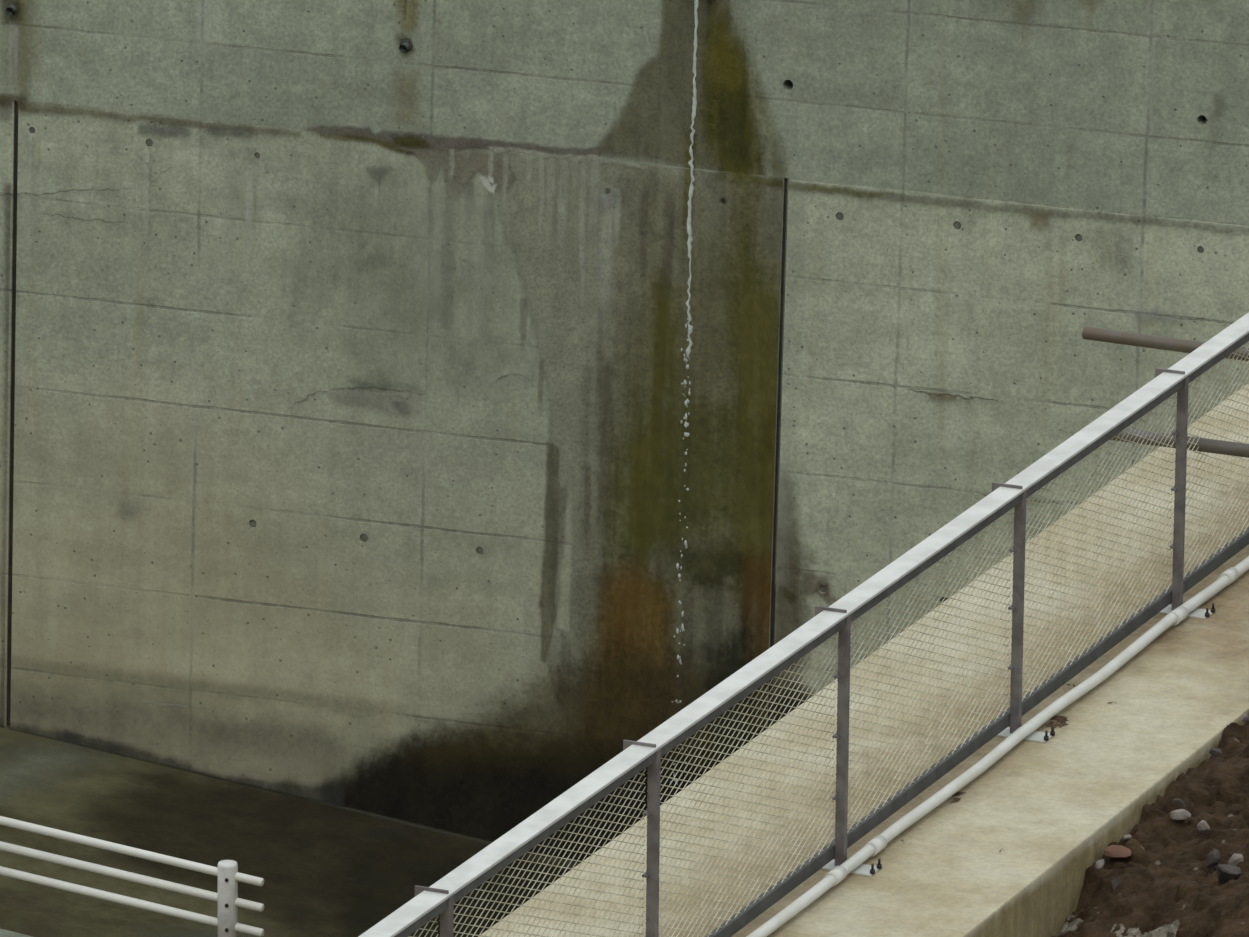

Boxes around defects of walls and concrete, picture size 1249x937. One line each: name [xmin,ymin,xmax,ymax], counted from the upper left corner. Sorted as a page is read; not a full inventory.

damp [0,0,815,937]